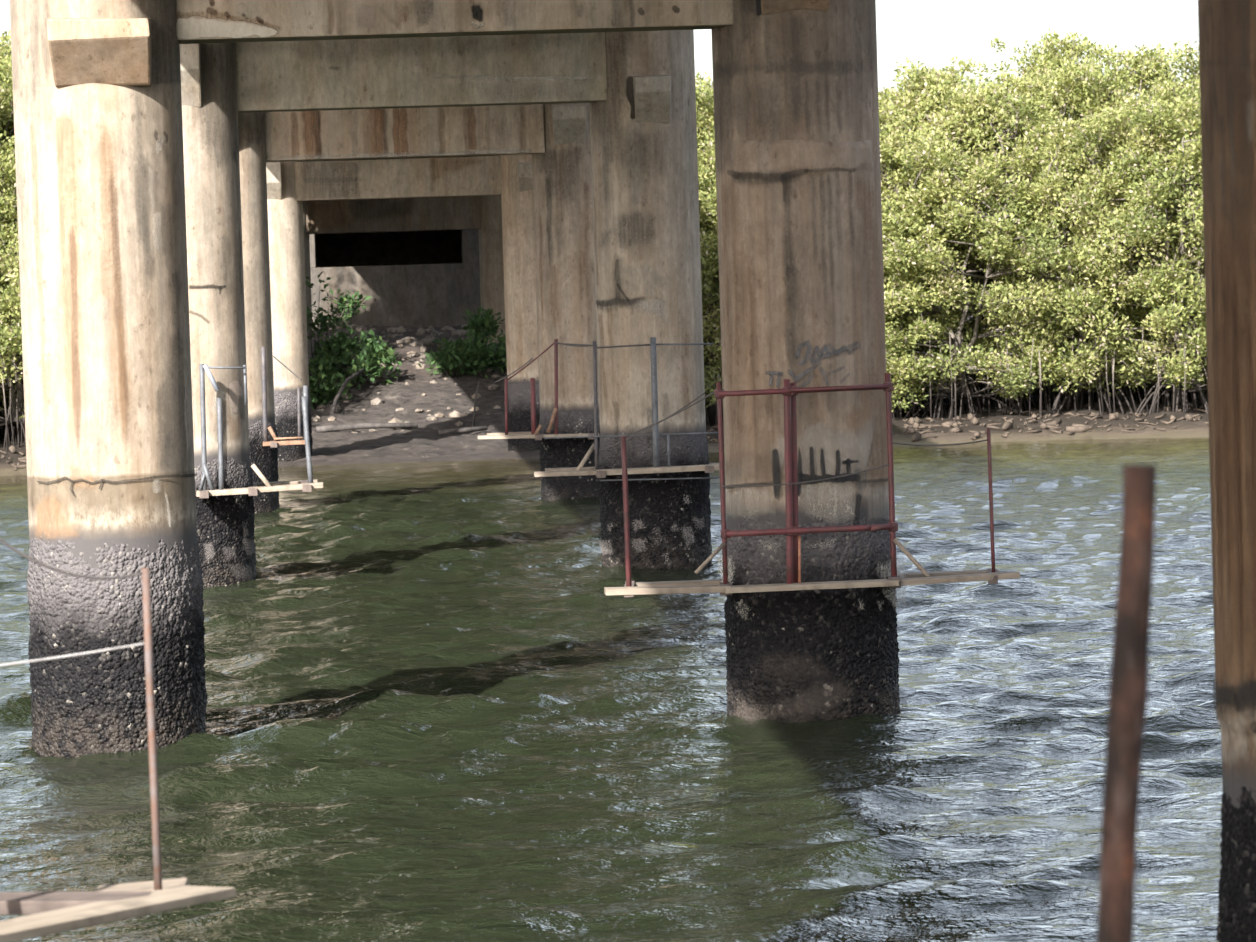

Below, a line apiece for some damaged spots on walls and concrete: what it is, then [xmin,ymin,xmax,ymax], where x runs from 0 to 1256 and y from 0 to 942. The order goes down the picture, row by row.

corrosion [303,111,322,159]
corrosion [375,108,408,157]
crack [37,474,197,496]